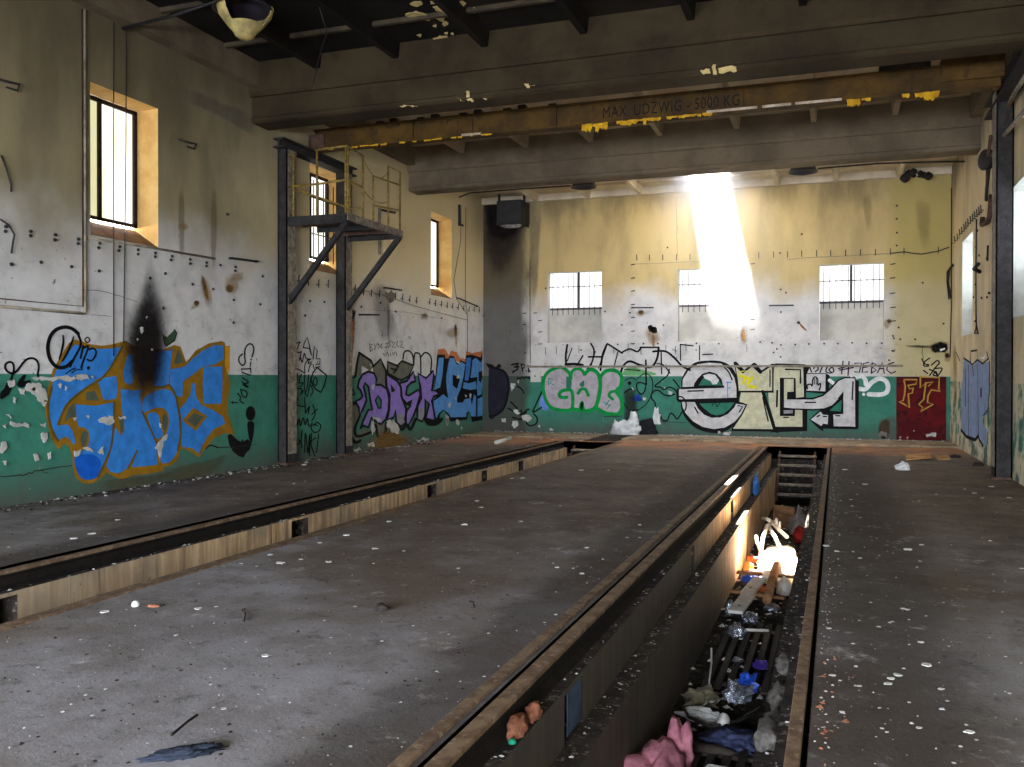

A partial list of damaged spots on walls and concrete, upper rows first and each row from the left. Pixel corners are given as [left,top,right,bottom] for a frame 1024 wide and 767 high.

peeling [405,1,454,40]
peeling [700,64,737,75]
peeling [847,98,871,107]
peeling [902,91,940,101]
peeling [582,113,712,133]
peeling [352,133,492,148]
peeling [3,374,93,461]
spalling [0,409,615,624]